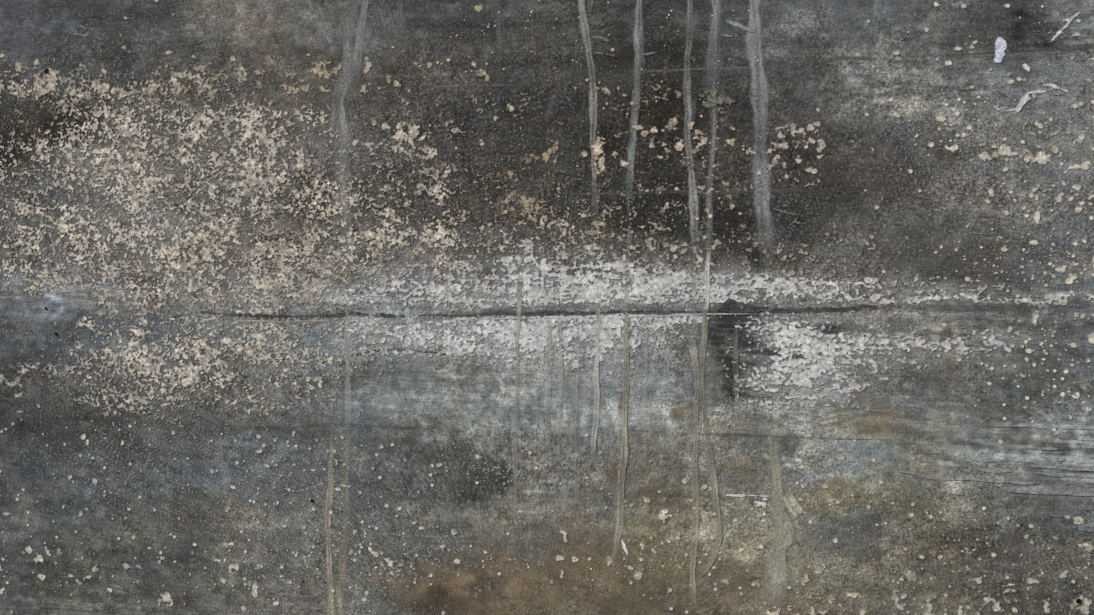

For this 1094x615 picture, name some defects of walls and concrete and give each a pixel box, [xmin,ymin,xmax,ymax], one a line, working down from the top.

water stain [578,0,611,203]
water stain [615,0,773,268]
crack [168,304,922,323]
water stain [325,438,349,615]
water stain [689,257,807,601]